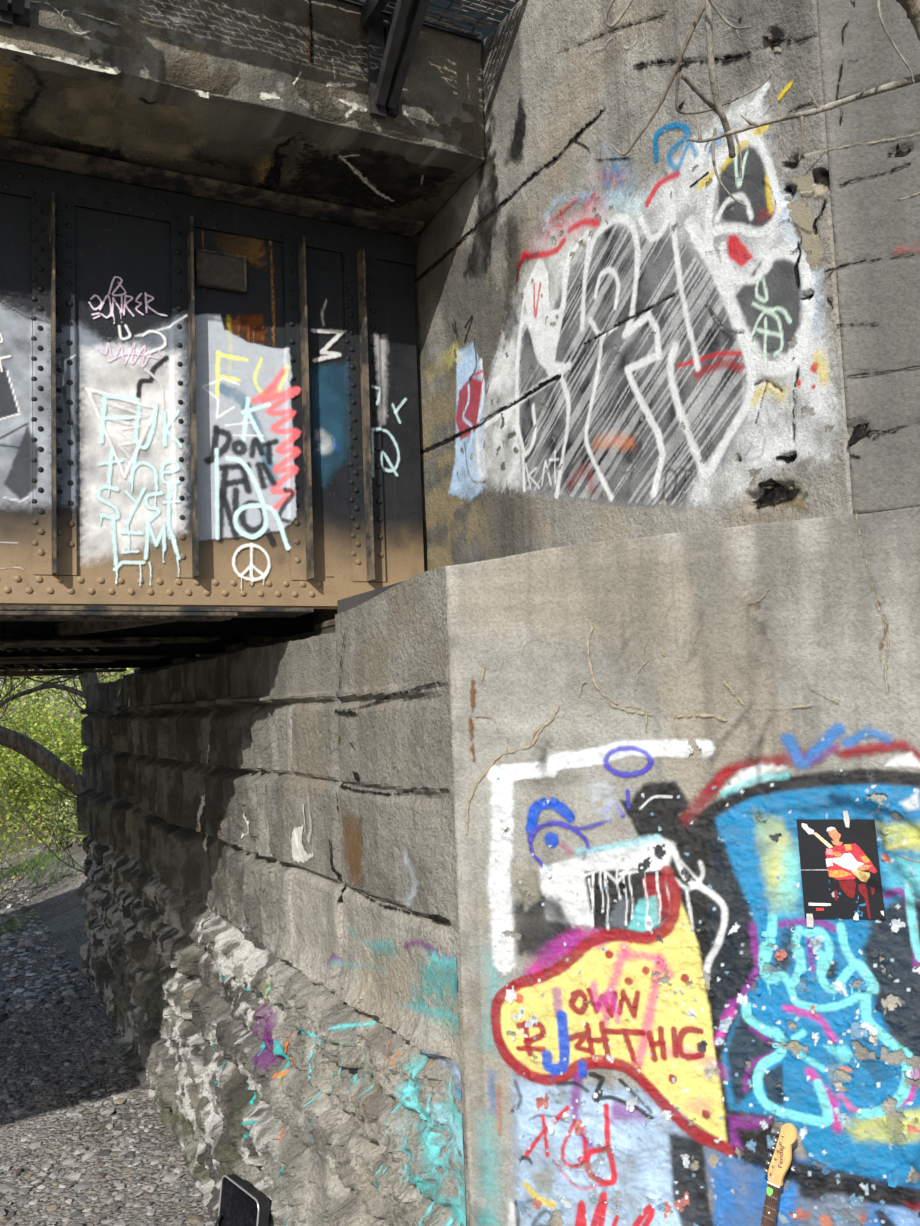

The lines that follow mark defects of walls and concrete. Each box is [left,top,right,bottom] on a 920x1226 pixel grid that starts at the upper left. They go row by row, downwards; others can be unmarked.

crack [558,13,765,74]
damp [284,137,455,214]
crack [414,109,605,282]
crack [724,0,920,326]
crack [754,368,799,440]
crack [847,365,920,377]
spalling [753,478,808,509]
spalling [775,453,798,463]